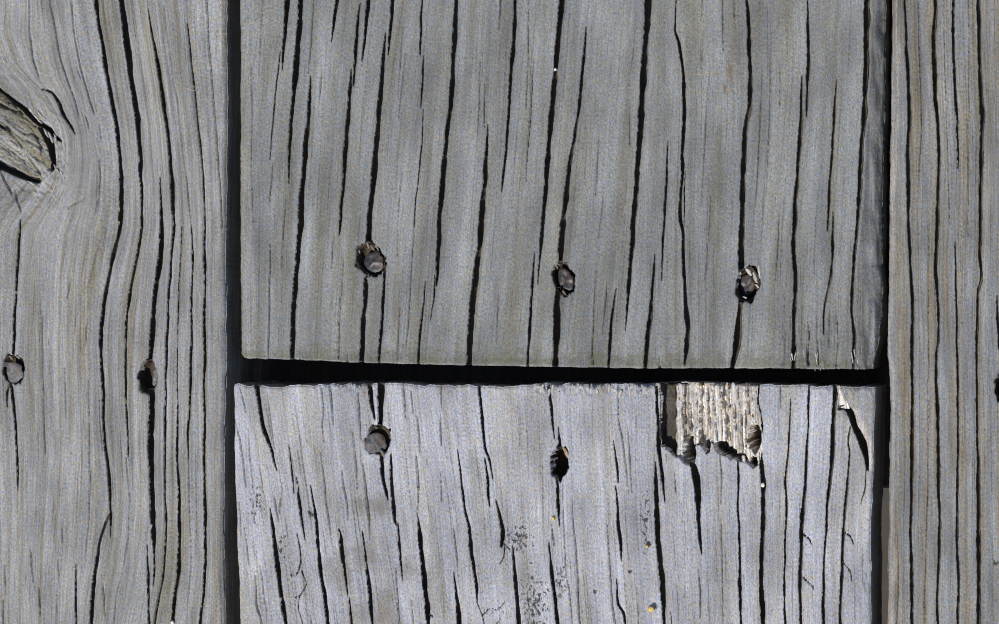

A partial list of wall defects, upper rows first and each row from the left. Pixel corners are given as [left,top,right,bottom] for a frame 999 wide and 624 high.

crack [730,302,743,368]
crack [737,0,870,624]
spalling [660,382,763,465]